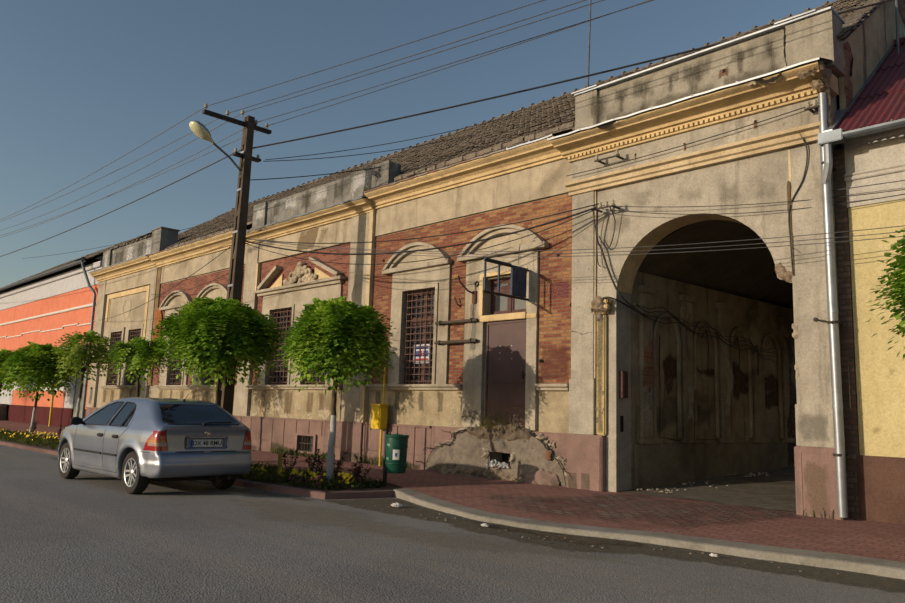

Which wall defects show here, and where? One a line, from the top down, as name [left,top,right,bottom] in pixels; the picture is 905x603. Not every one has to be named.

crack [781,28,789,66]
flaking render [775,262,793,283]
leakage [785,337,826,465]
flaking render [425,402,567,487]